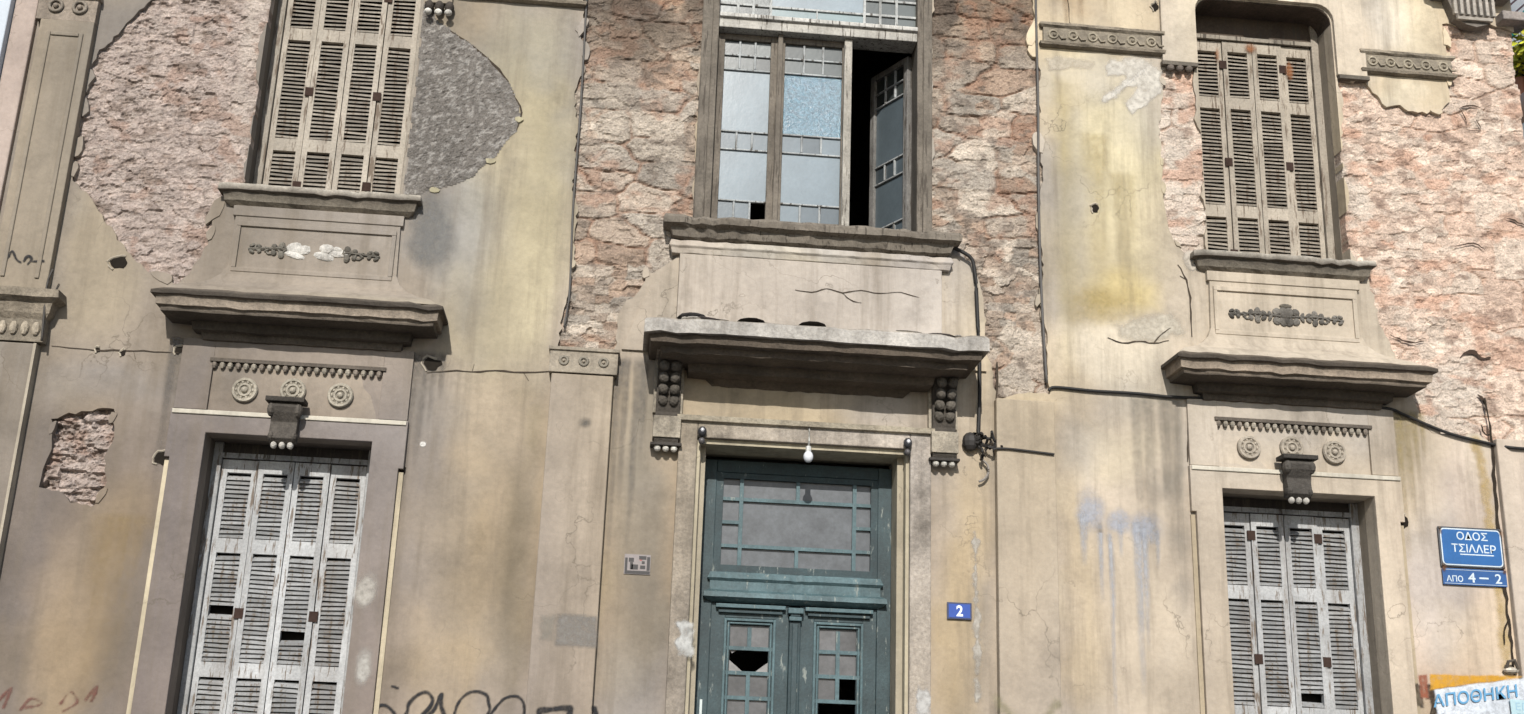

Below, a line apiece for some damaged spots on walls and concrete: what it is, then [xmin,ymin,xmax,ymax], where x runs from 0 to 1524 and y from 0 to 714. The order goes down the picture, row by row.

flaking render [70,0,275,285]
flaking render [404,4,523,195]
flaking render [558,0,704,349]
crack [797,288,917,303]
flaking render [932,0,1206,398]
flaking render [1334,24,1524,442]
flaking render [42,410,117,507]